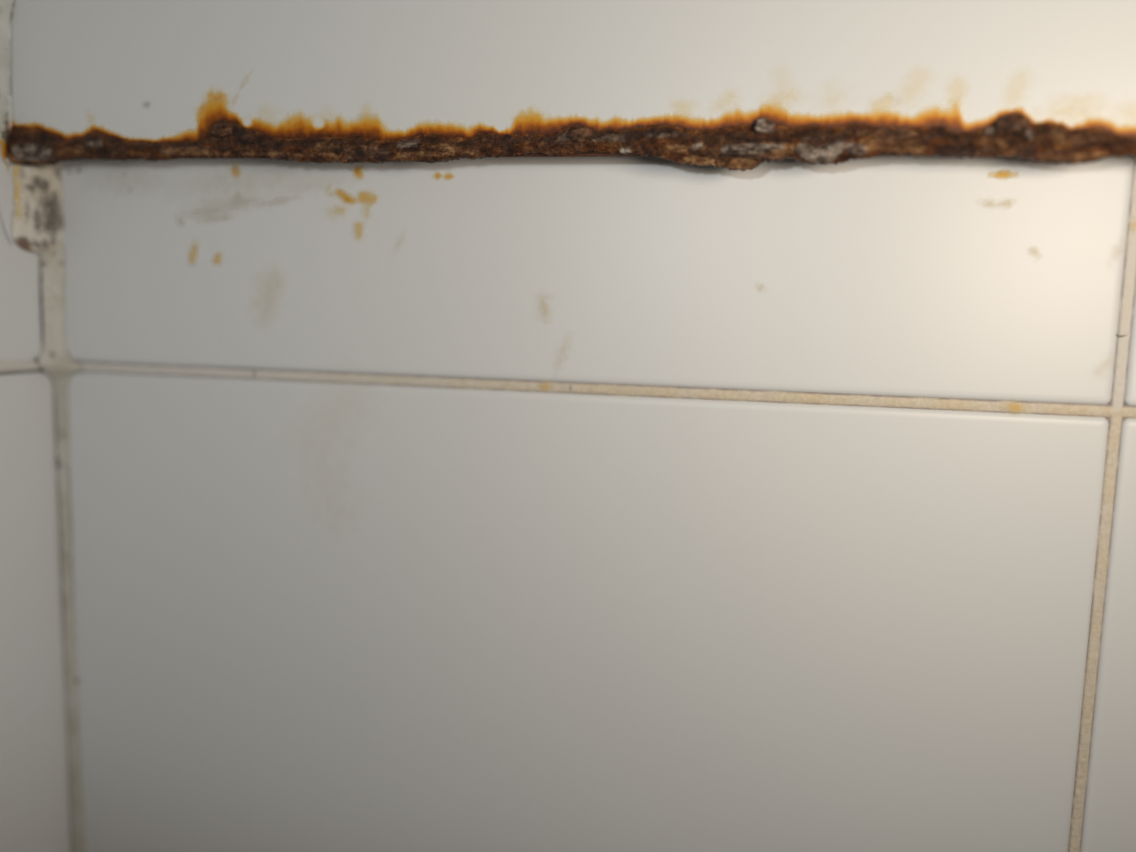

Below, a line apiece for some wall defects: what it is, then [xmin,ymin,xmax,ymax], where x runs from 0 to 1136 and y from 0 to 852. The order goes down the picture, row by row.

corrosion [0,91,1136,215]